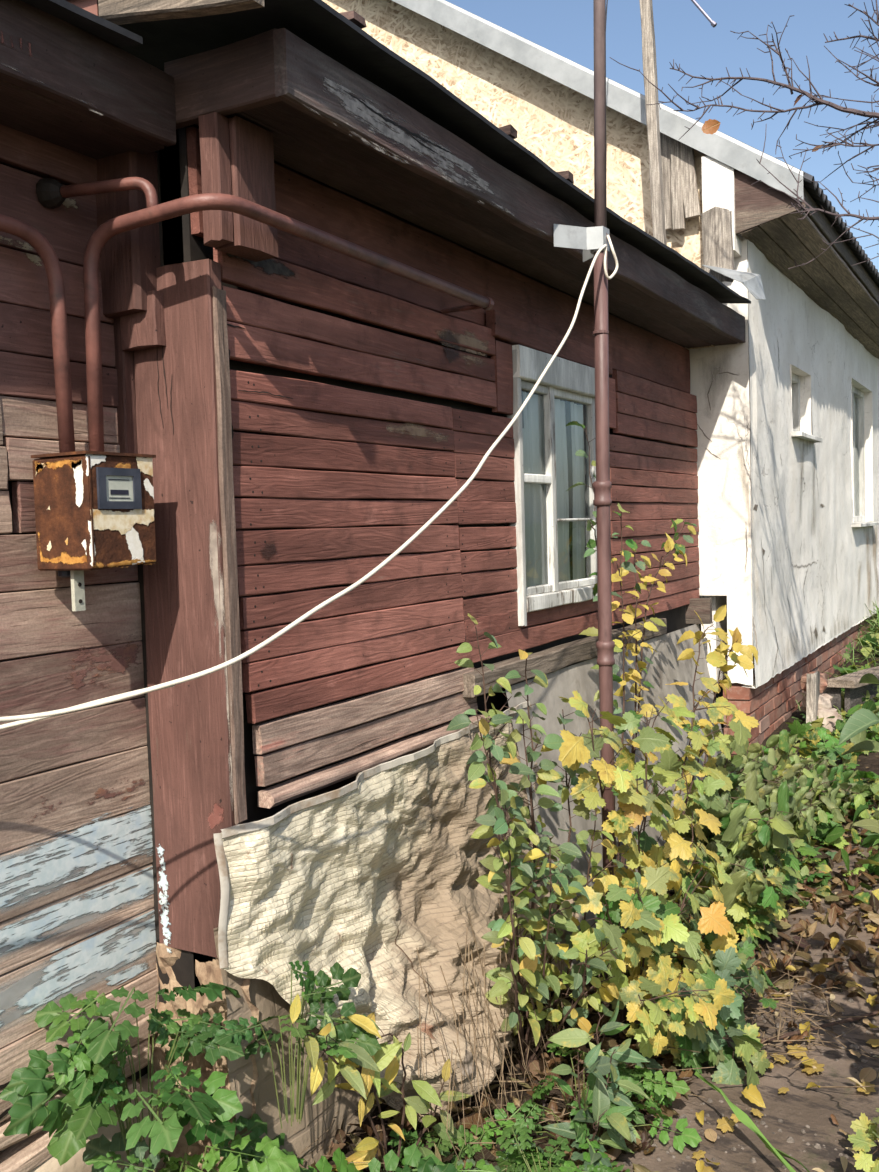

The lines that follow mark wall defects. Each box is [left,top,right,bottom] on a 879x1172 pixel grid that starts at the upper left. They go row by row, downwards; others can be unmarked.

peeling [324,77,514,216]
peeling [0,778,172,1027]
crack [0,1081,11,1119]